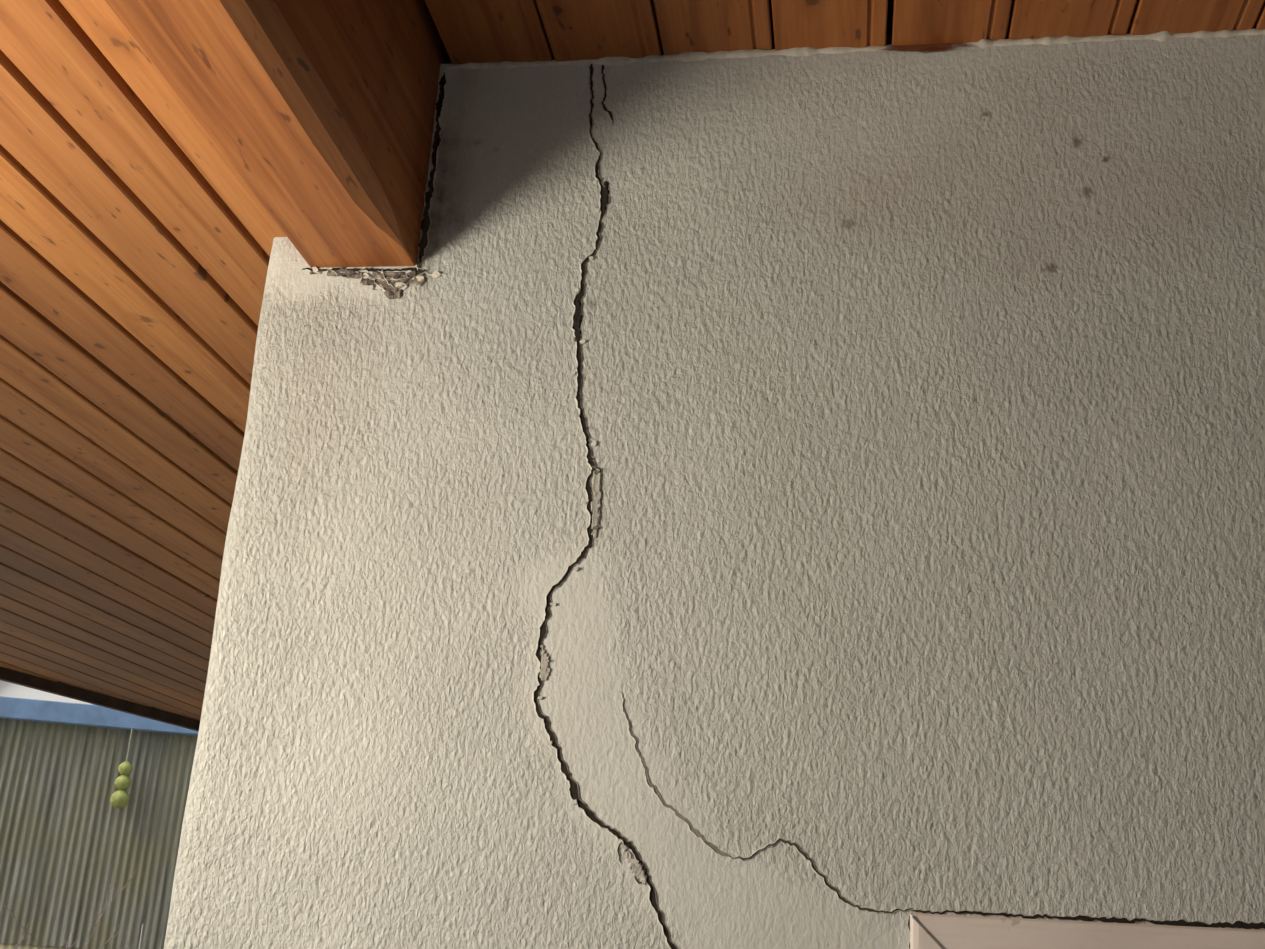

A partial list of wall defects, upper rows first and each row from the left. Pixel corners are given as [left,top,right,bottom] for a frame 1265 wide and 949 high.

spalling [310,267,441,299]
crack [533,63,678,949]
crack [621,692,1265,949]